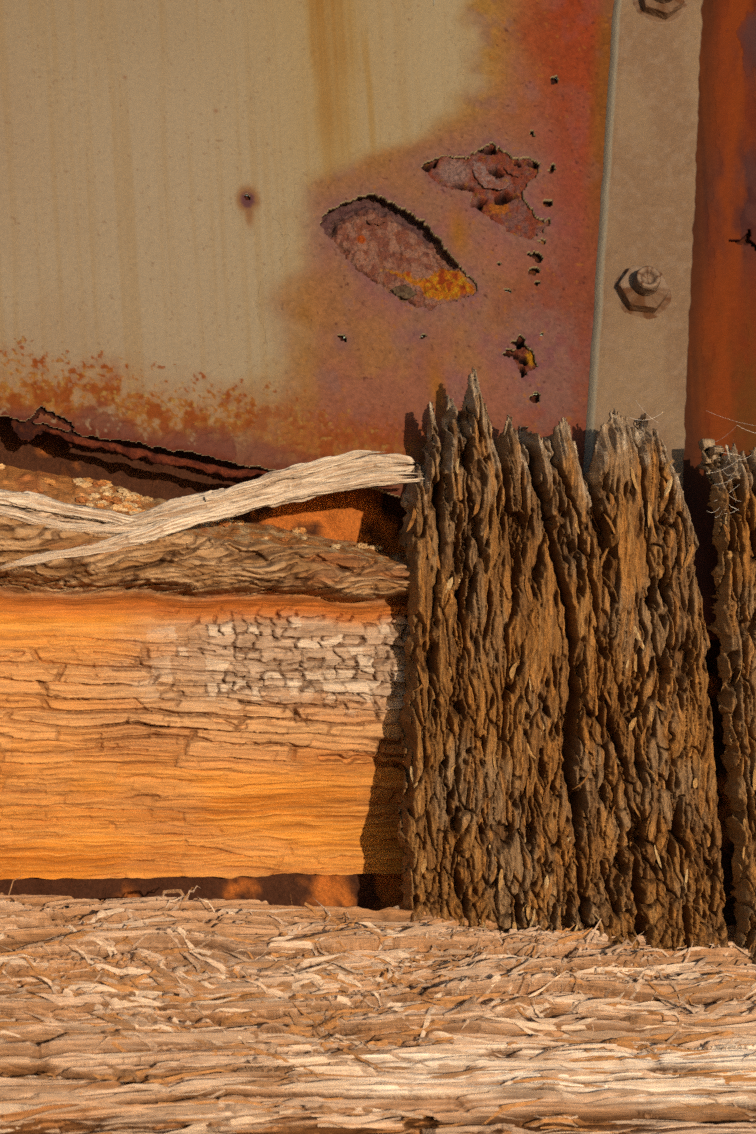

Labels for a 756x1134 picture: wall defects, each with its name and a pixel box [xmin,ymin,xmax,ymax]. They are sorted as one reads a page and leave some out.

rust [0,0,614,497]
peeling [473,161,510,190]
rust [696,0,756,456]